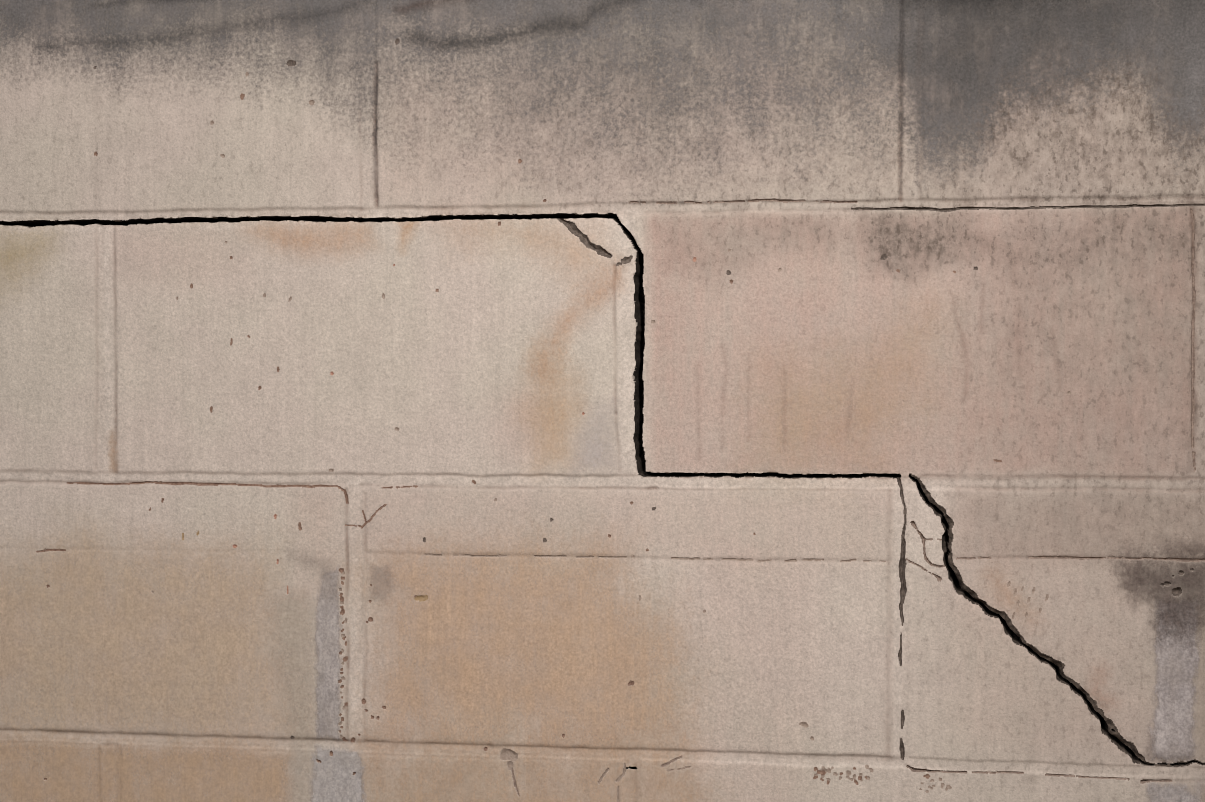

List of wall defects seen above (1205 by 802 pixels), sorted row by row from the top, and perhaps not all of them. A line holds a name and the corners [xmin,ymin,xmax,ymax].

crack [0,198,1205,784]
leakage [1123,549,1205,638]